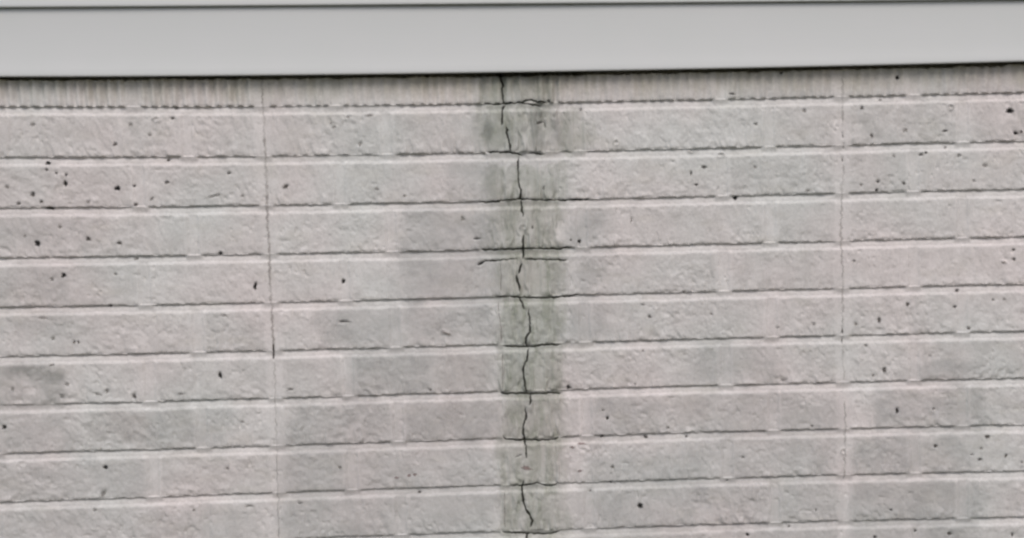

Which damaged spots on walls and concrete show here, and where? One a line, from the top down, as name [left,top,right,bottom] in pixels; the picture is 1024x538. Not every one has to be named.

crack [481,73,589,538]